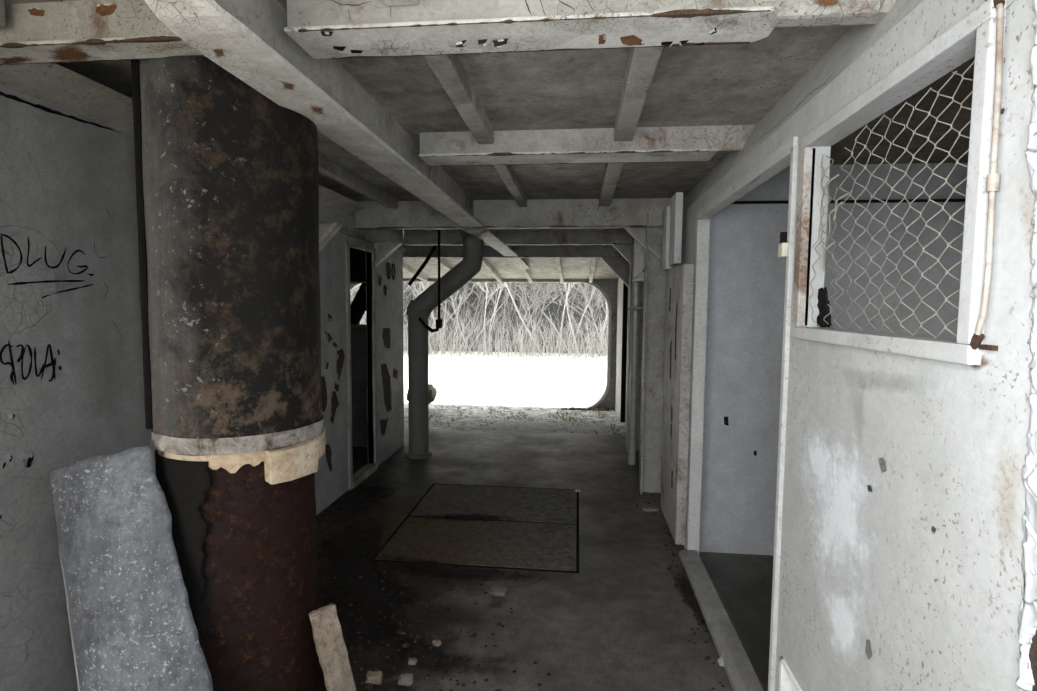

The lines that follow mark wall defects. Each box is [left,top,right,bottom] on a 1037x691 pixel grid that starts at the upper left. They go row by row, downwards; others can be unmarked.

corrosion [0,36,224,65]
crack [0,91,121,133]
peeling [321,313,345,423]
peeling [382,328,391,349]
peeling [380,363,399,436]
peeling [325,444,333,472]
damp [801,436,869,660]
peeling [1024,630,1037,691]